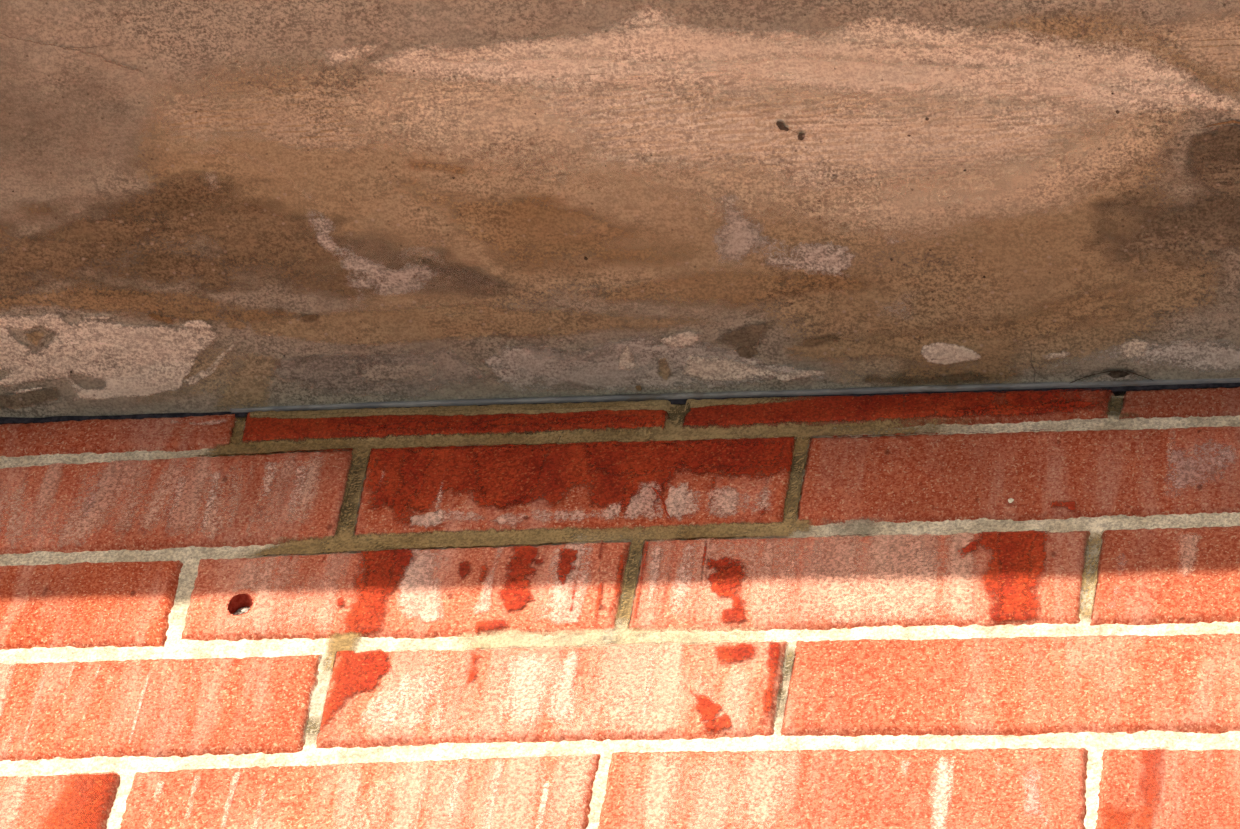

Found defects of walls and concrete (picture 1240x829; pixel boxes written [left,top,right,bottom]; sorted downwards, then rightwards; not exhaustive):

leakage [0,7,1240,391]
leakage [0,388,60,409]
leakage [61,461,136,544]
leakage [1168,444,1233,488]
leakage [146,355,1128,739]
leakage [1180,536,1198,573]